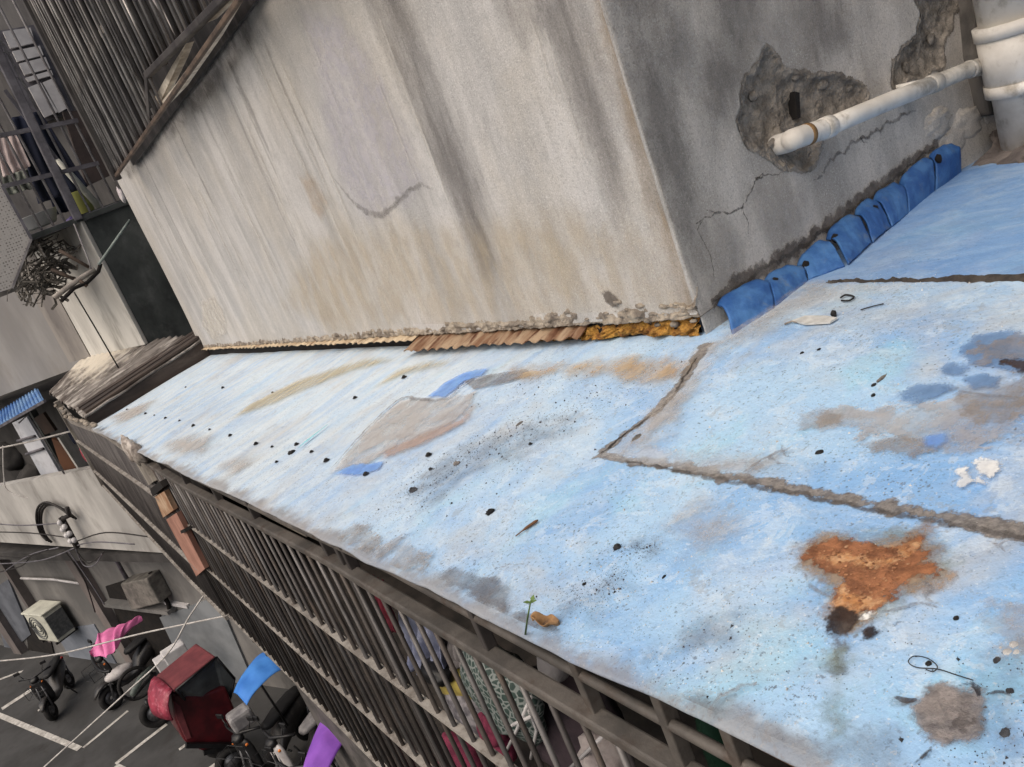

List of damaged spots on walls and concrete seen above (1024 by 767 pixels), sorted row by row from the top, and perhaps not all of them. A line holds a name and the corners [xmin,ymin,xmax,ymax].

spalling [891,0,959,90]
spalling [735,43,871,174]
crack [814,112,910,180]
crack [700,173,772,225]
water stain [901,331,1024,402]
peeling [335,369,528,475]
rust [799,526,955,661]